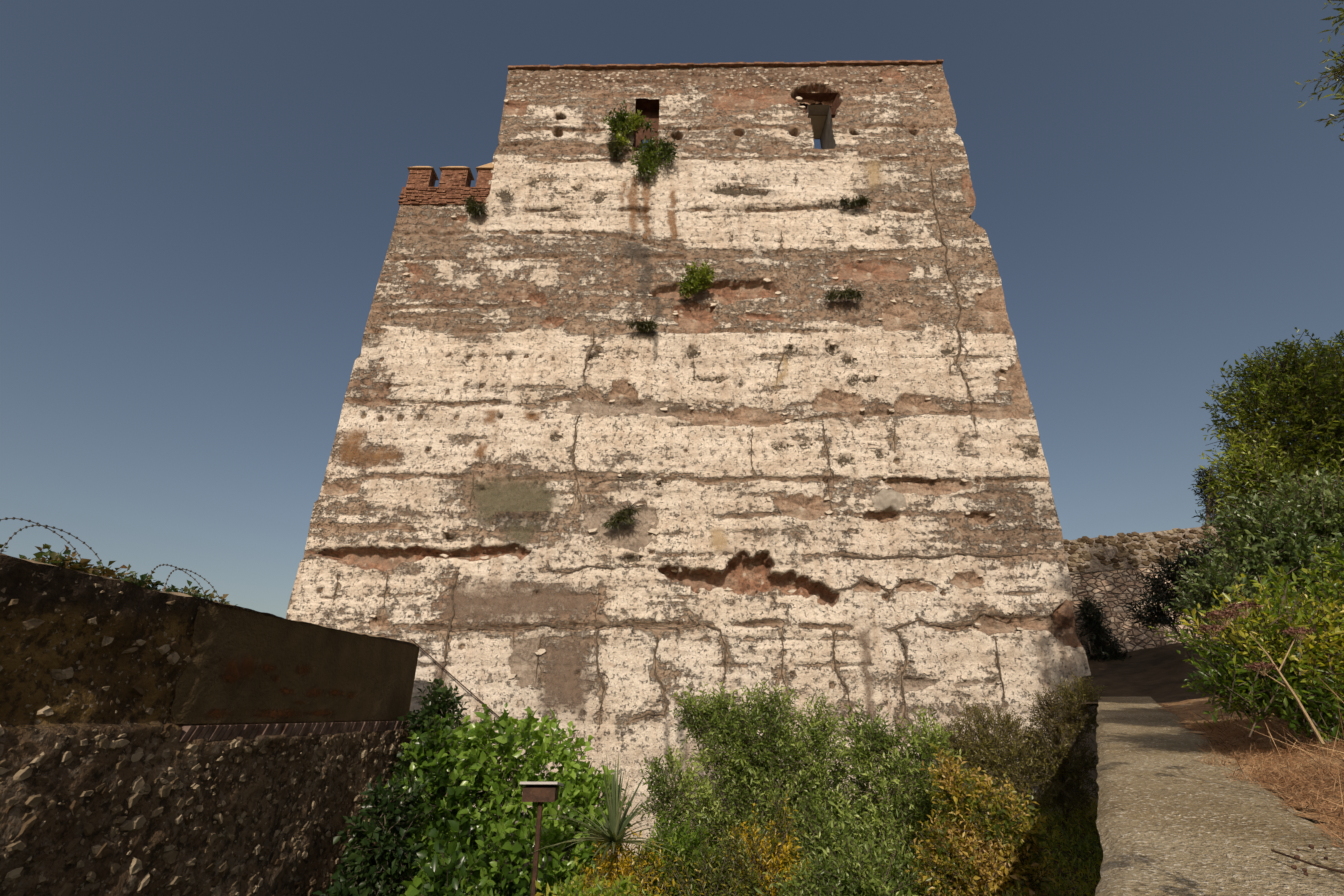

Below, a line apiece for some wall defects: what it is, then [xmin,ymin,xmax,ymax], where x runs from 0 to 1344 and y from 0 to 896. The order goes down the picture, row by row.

spalling [648,278,784,359]
crack [916,166,977,433]
crack [570,329,640,501]
spalling [658,546,985,607]
crack [777,632,788,695]
crack [832,552,1055,731]
spalling [970,599,1083,648]